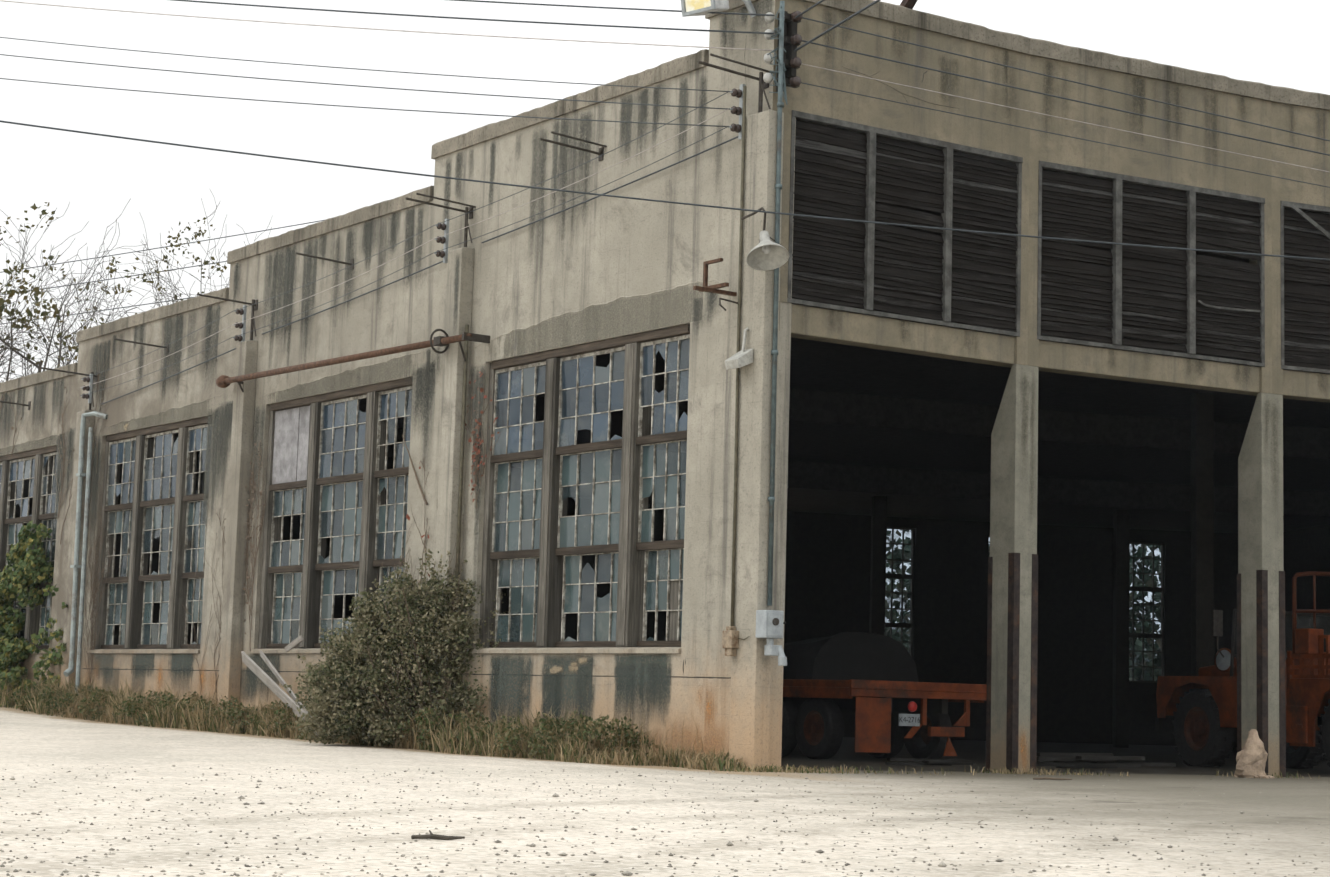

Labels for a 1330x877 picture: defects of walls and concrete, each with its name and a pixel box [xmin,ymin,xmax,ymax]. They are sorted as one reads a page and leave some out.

damp [621,93,647,145]
damp [678,80,706,148]
damp [444,159,461,219]
damp [552,123,570,206]
damp [347,209,423,272]
damp [271,238,325,352]
damp [489,656,593,724]
damp [615,654,671,718]